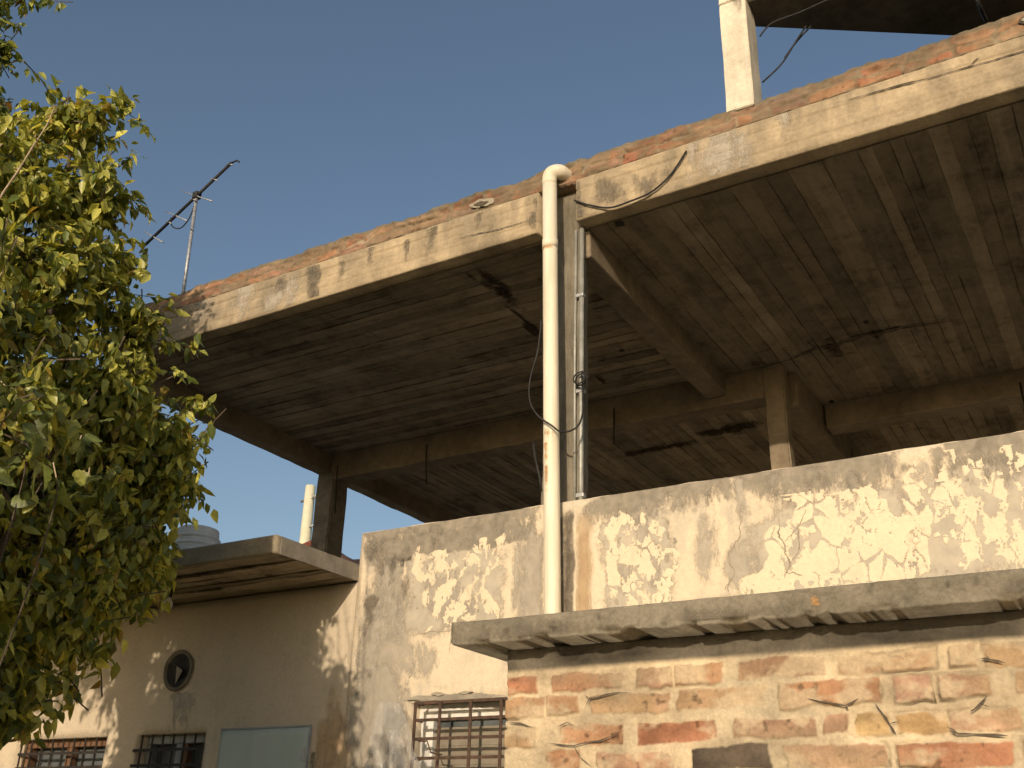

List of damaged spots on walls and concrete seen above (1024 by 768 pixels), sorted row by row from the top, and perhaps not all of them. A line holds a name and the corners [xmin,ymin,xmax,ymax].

peeling [403,533,507,642]
leakage [311,451,910,768]
peeling [594,502,681,608]
peeling [739,444,1024,594]